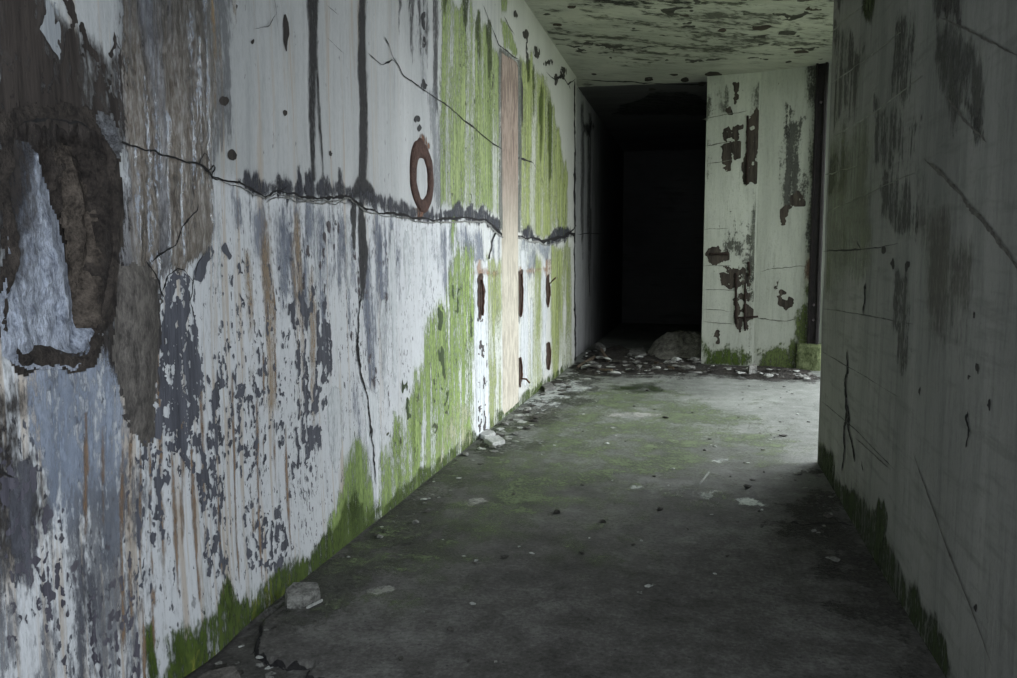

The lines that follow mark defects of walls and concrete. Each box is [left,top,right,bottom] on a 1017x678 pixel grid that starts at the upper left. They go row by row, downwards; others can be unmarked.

peeling [0,447,86,645]
spalling [0,0,130,377]
peeling [80,243,333,678]
damp [234,199,267,275]
crack [356,284,376,482]
crack [121,74,706,361]
damp [240,0,594,501]
rust [477,260,495,320]
rust [519,357,530,387]
rust [518,261,556,317]
spalling [705,246,754,333]
crack [924,159,1017,268]